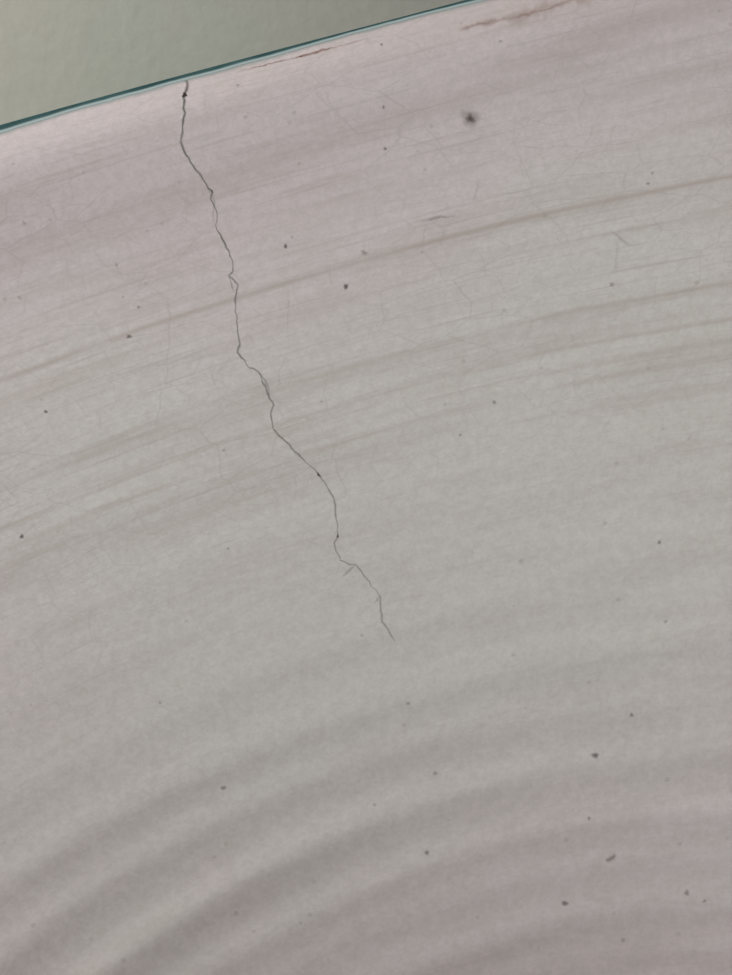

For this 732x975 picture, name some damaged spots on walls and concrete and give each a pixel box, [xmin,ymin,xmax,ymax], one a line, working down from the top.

crack [181,87,237,292]